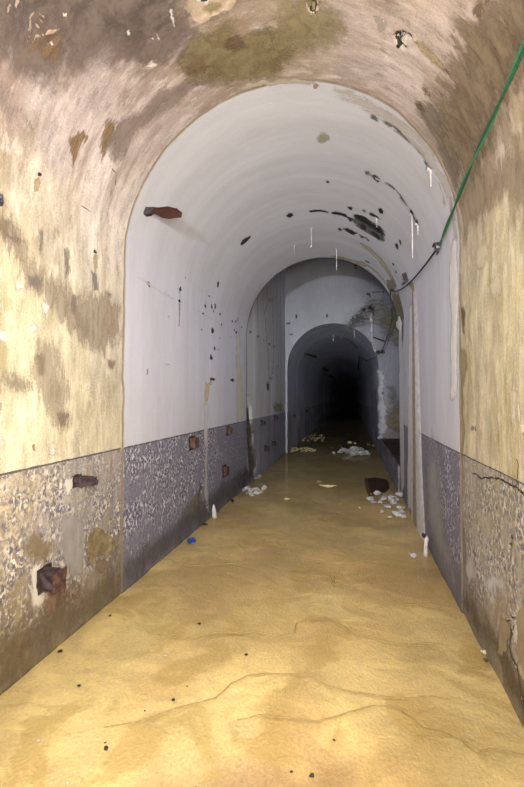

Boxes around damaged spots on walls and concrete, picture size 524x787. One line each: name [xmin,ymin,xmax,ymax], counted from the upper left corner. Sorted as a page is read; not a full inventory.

spalling [27,12,61,62]
spalling [184,0,236,24]
rust [143,206,182,219]
water stain [332,256,412,509]
crack [461,454,524,495]
spalling [497,601,524,679]